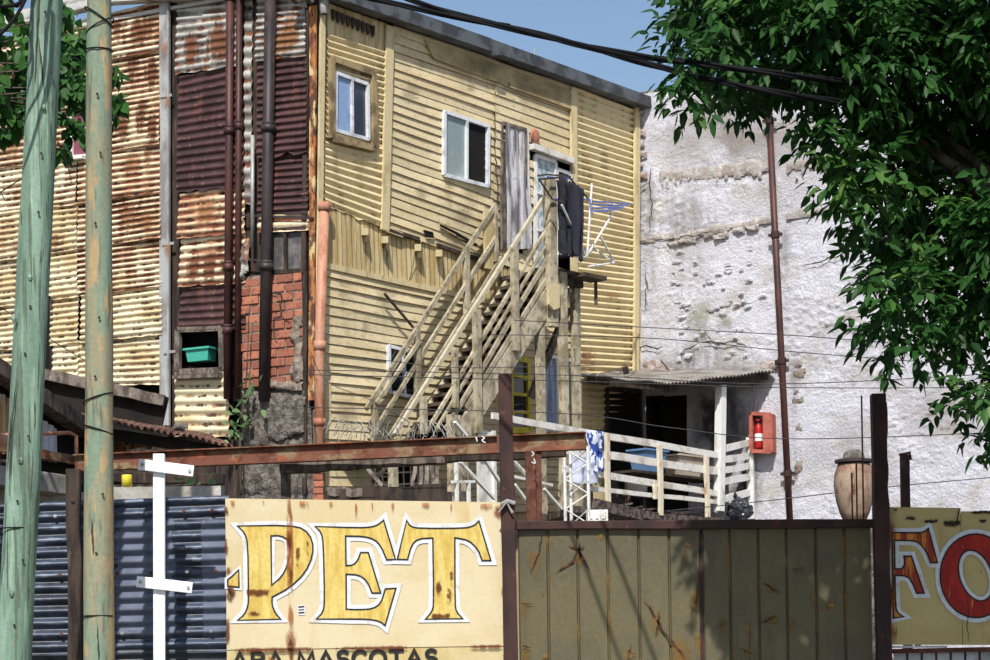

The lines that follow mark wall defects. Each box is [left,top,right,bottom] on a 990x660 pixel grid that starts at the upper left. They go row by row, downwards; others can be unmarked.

corrosion [112,13,154,44]
corrosion [184,22,226,64]
corrosion [275,17,298,52]
corrosion [114,42,166,176]
corrosion [187,234,235,281]
corrosion [644,599,687,660]